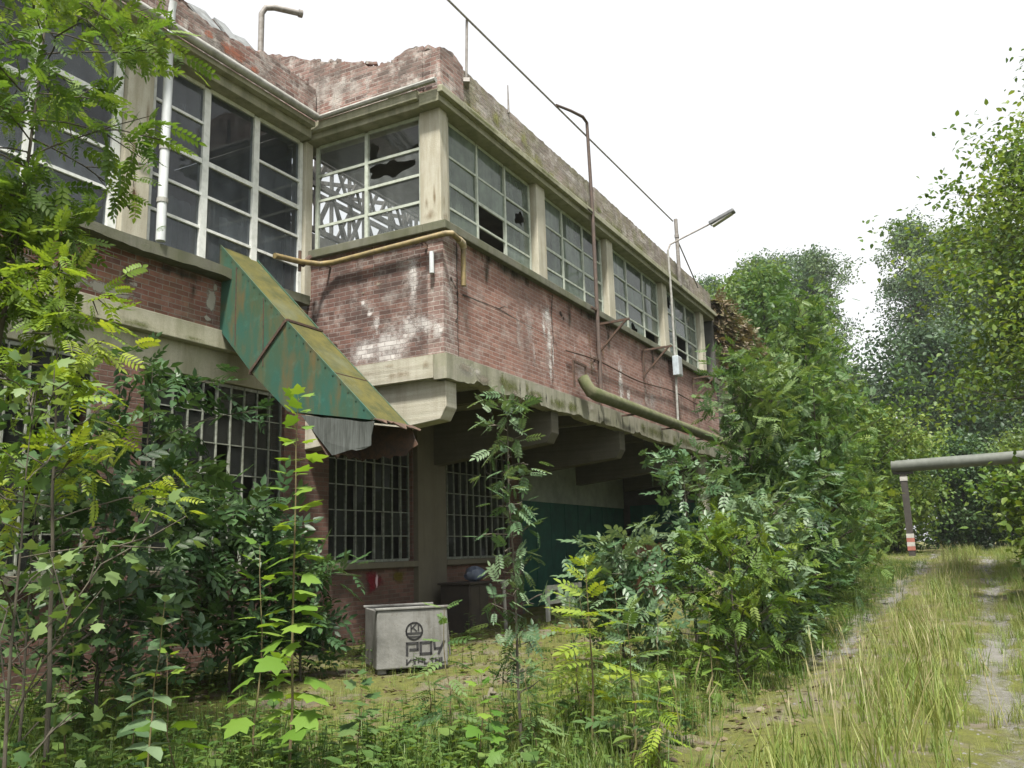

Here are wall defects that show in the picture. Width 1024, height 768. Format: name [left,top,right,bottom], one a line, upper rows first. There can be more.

water stain [486,257,528,284]
water stain [357,301,442,361]